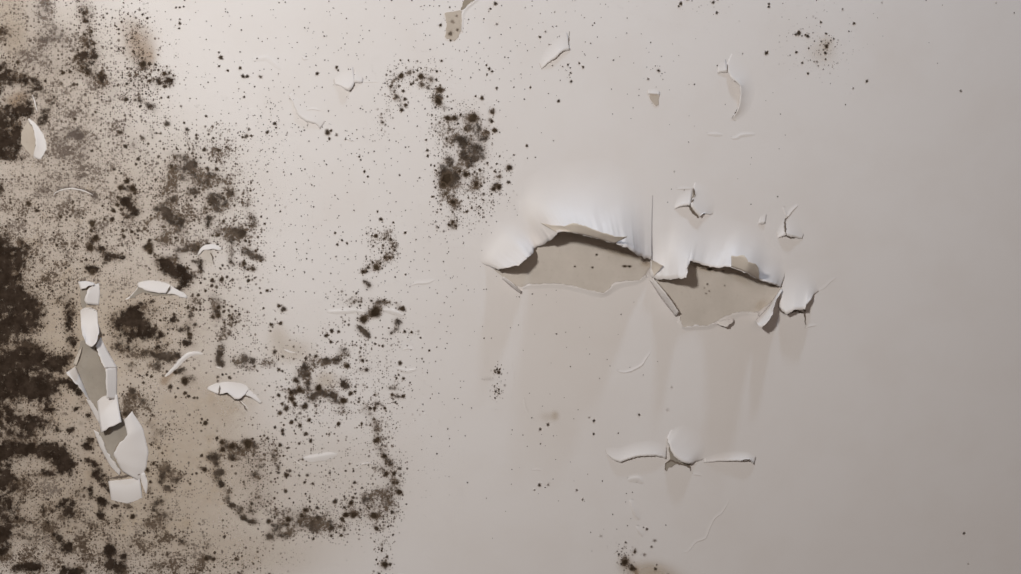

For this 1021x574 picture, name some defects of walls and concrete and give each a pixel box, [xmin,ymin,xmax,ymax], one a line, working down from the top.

peeling [445,0,480,41]
peeling [539,31,570,69]
peeling [21,117,49,161]
peeling [479,158,819,331]
peeling [124,279,187,300]
water stain [0,0,560,574]
peeling [66,281,148,503]
peeling [206,380,263,412]
peeling [605,425,756,476]